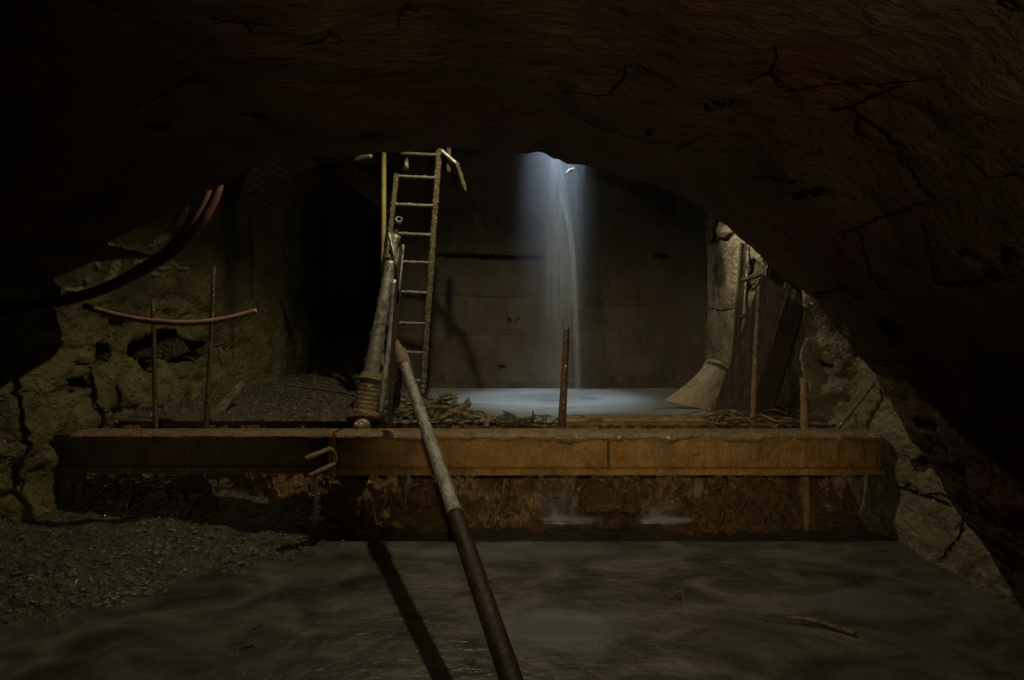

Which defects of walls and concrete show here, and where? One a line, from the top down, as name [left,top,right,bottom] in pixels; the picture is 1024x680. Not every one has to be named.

crack [746,47,935,298]
crack [894,482,966,562]